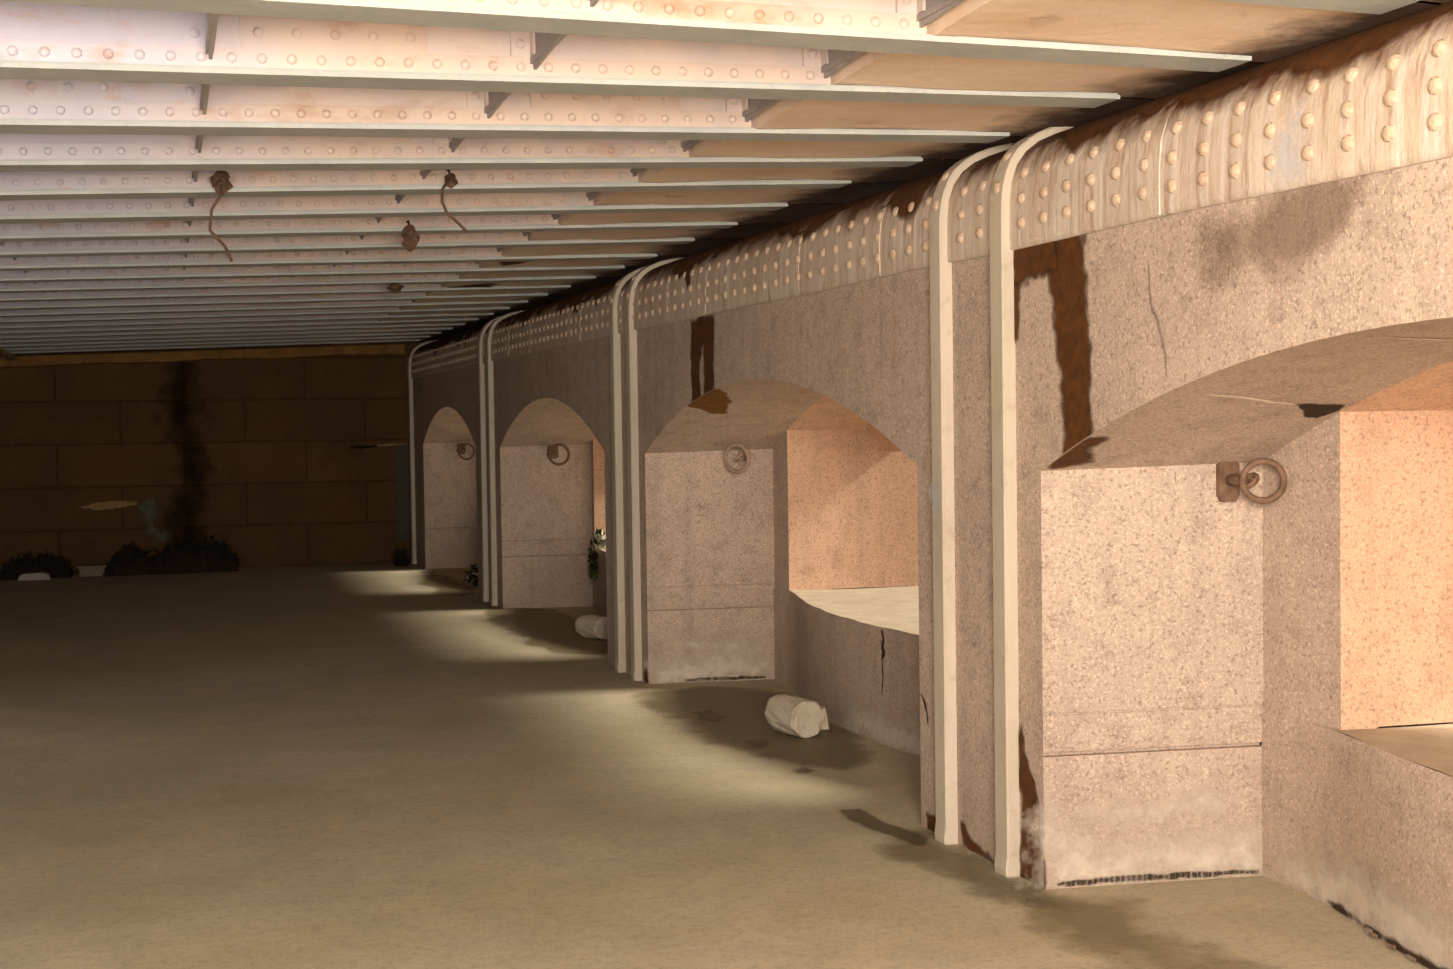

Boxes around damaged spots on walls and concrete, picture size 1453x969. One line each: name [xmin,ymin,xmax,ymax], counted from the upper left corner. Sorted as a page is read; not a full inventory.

corrosion [688,315,732,414]
corrosion [1013,234,1107,469]
crack [879,630,887,689]
corrosion [1018,727,1046,889]
leakage [842,809,1260,969]
leakage [1286,866,1453,969]